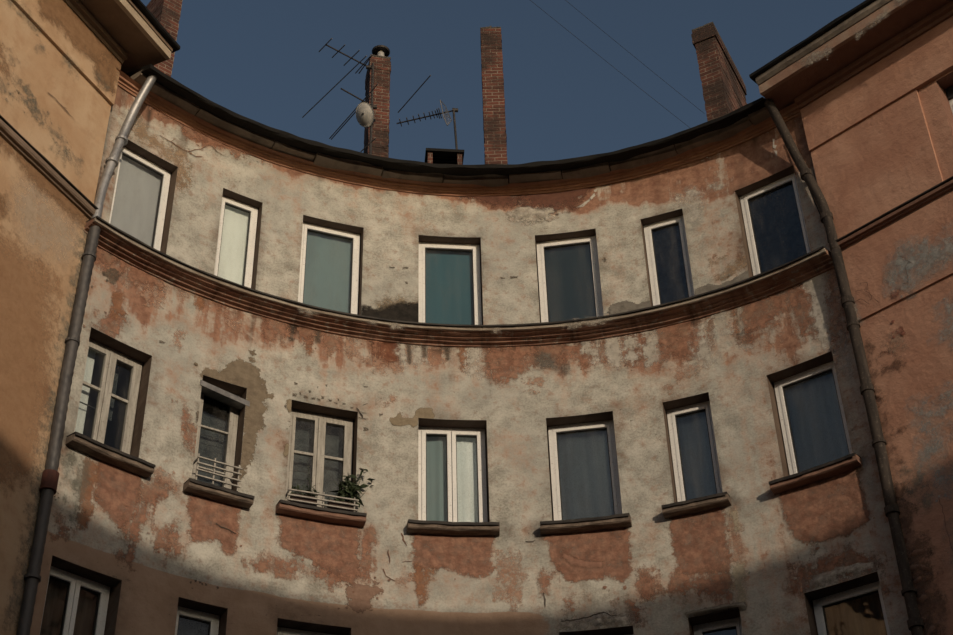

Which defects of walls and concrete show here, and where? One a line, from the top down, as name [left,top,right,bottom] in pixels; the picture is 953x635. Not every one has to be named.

flaking render [194,350,274,479]
spalling [284,382,353,412]
damp [361,298,419,322]
peeling [483,321,705,394]
peeling [94,461,745,627]
peeling [779,467,890,595]